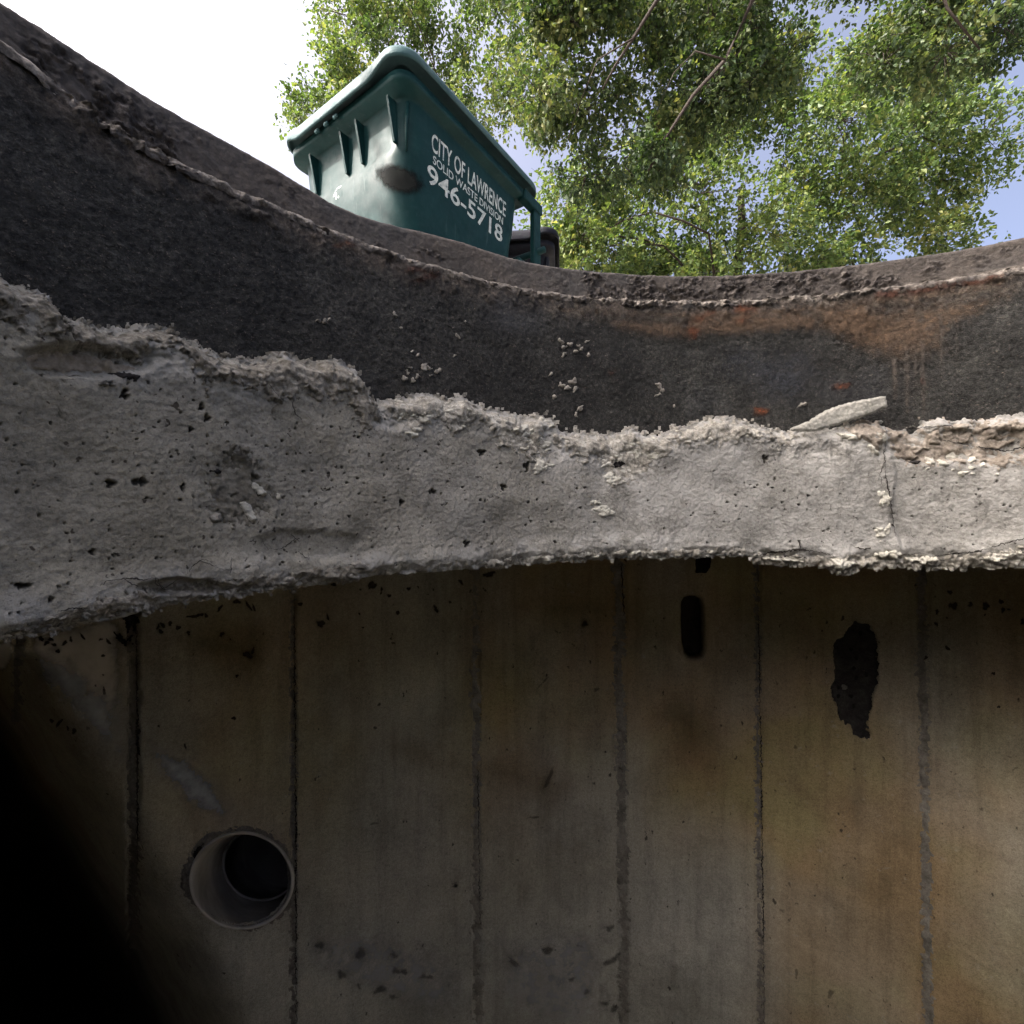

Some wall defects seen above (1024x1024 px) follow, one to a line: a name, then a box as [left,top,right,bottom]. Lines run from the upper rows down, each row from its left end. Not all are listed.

spalling [0,273,806,490]
crack [880,428,1024,557]